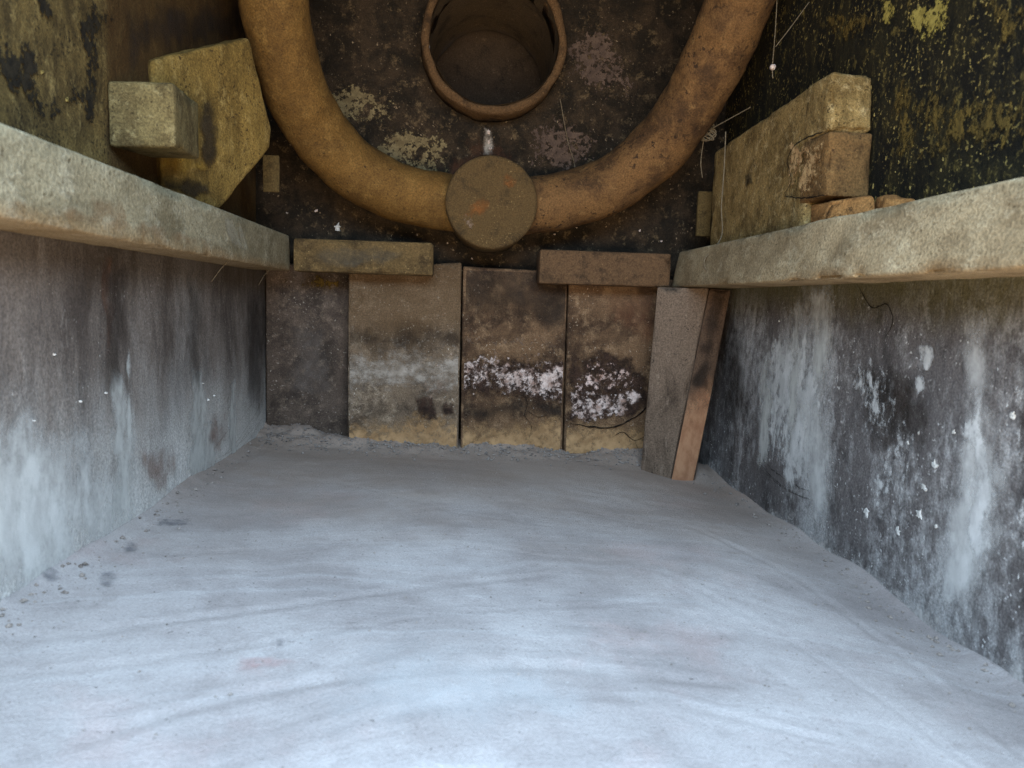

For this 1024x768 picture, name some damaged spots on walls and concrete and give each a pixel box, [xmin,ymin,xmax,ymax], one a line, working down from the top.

water stain [891,61,1024,160]
water stain [986,0,1024,42]
water stain [0,355,134,591]
water stain [758,293,829,518]
water stain [942,345,1003,602]